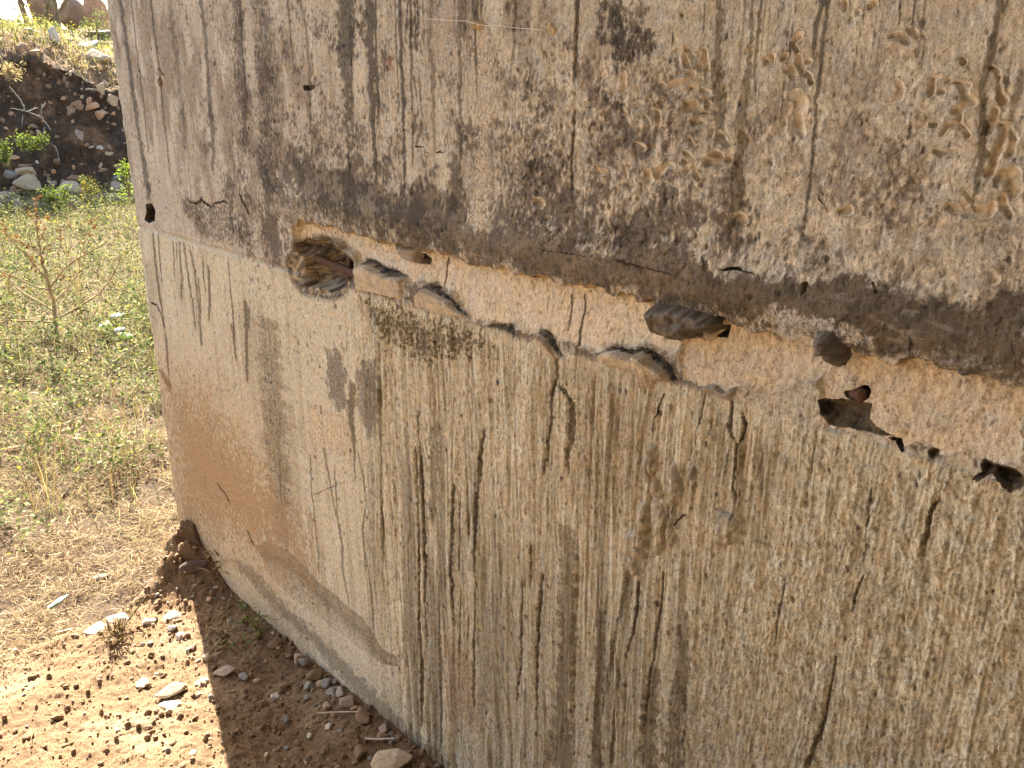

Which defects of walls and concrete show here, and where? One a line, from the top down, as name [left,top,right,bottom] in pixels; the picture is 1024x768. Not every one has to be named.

water stain [152,233,211,375]
crack [189,193,249,214]
water stain [230,0,1024,387]
spalling [287,218,1024,493]
water stain [227,256,458,768]